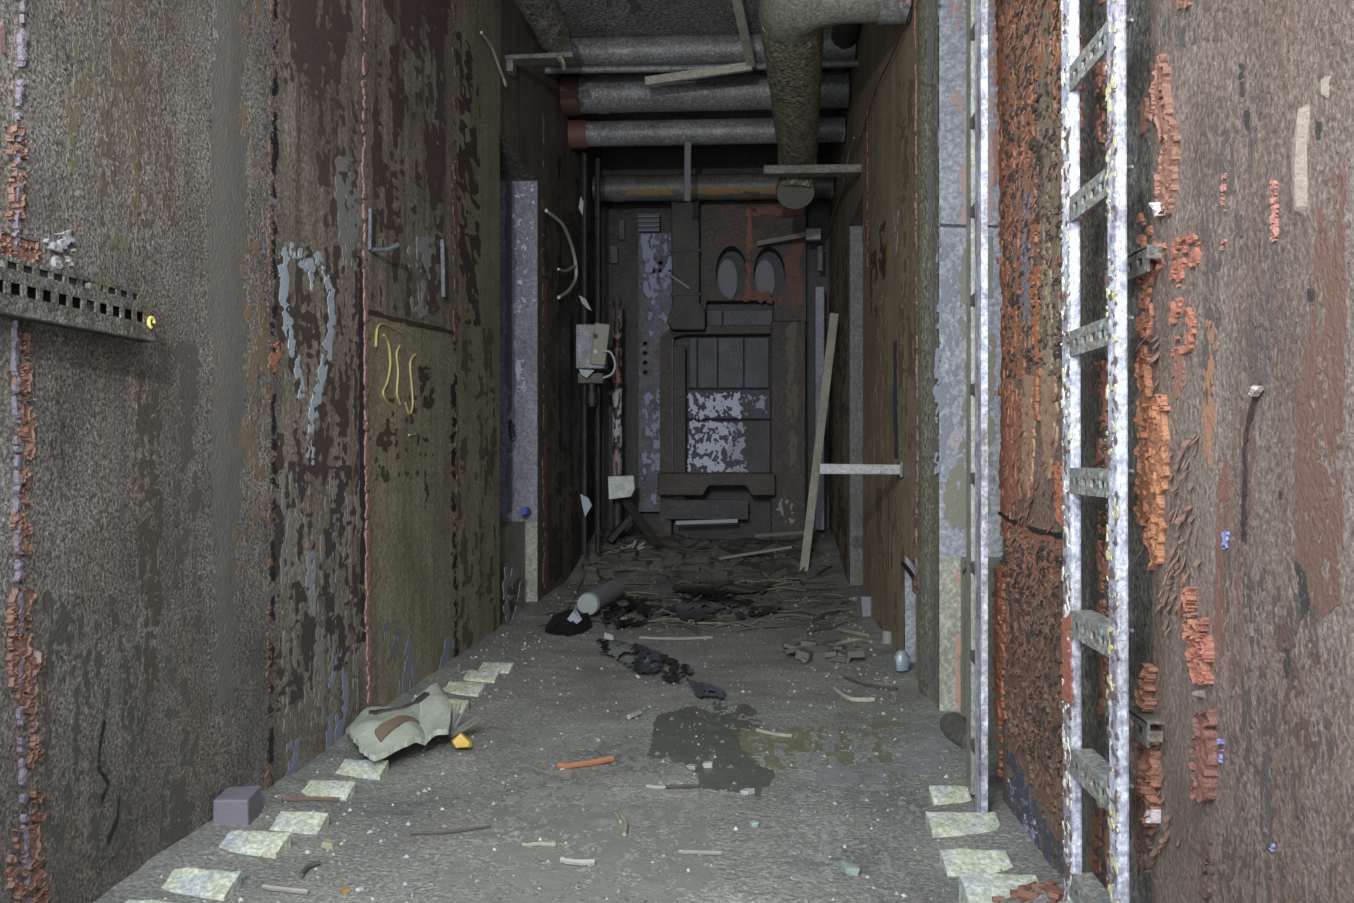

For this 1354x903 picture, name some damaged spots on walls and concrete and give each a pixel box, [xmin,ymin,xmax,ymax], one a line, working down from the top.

peeling [686,392,768,473]
peeling [785,321,799,468]
corrosion [998,379,1033,512]
water stain [438,701,951,903]